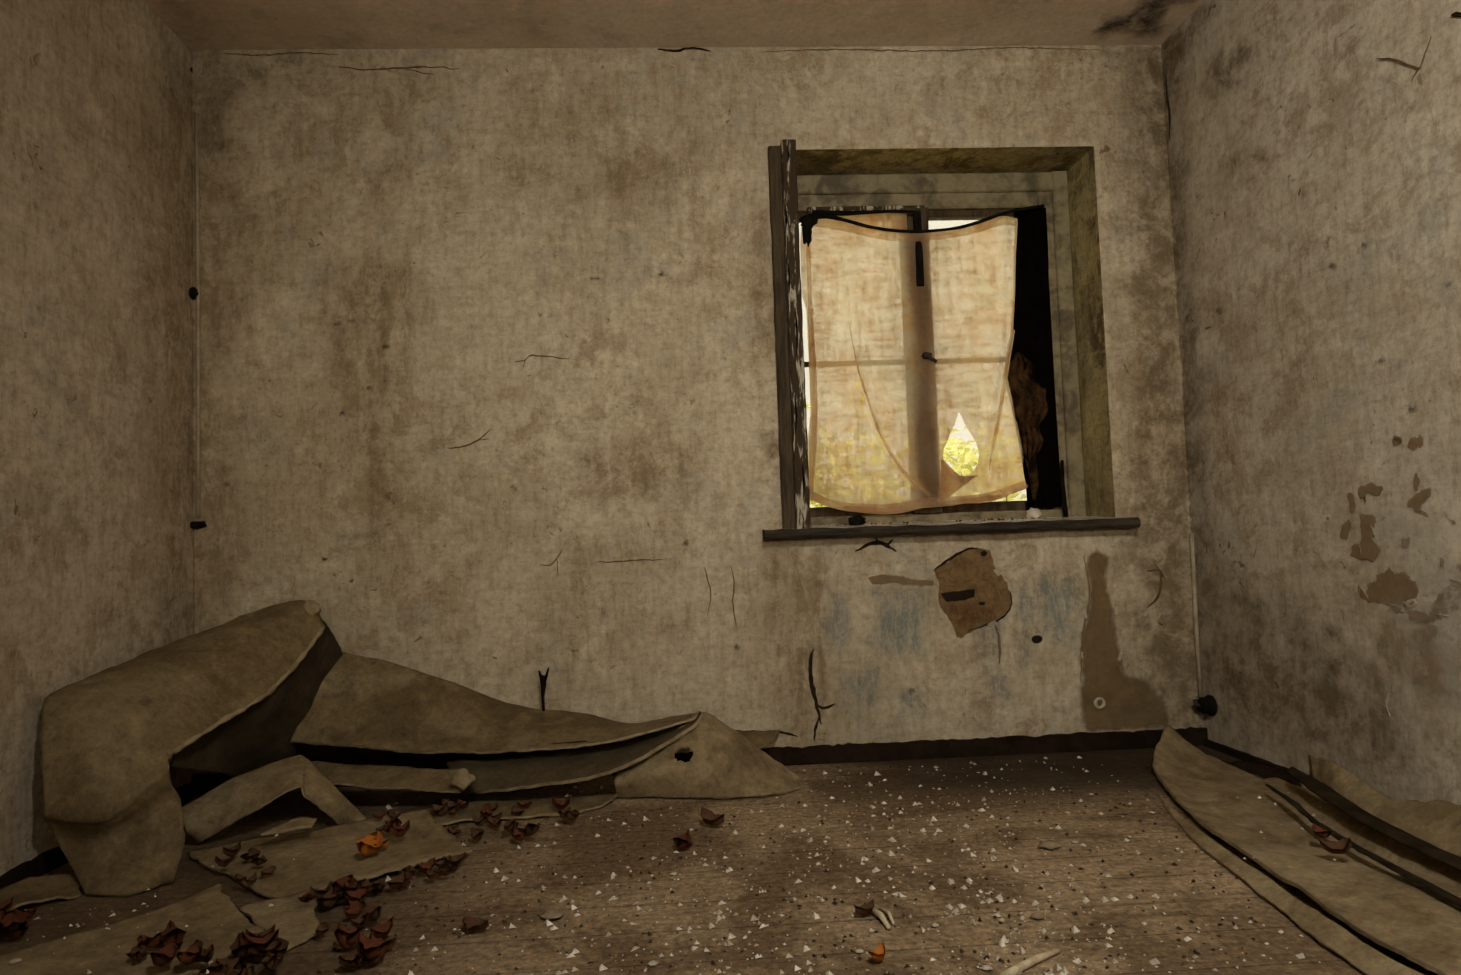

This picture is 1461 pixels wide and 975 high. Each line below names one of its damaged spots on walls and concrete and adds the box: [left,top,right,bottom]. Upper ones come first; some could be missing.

damp [1096,0,1388,745]
peeling [1392,435,1423,450]
peeling [1407,473,1455,524]
flaking render [868,547,1023,638]
peeling [1340,482,1461,641]
crack [780,649,836,741]